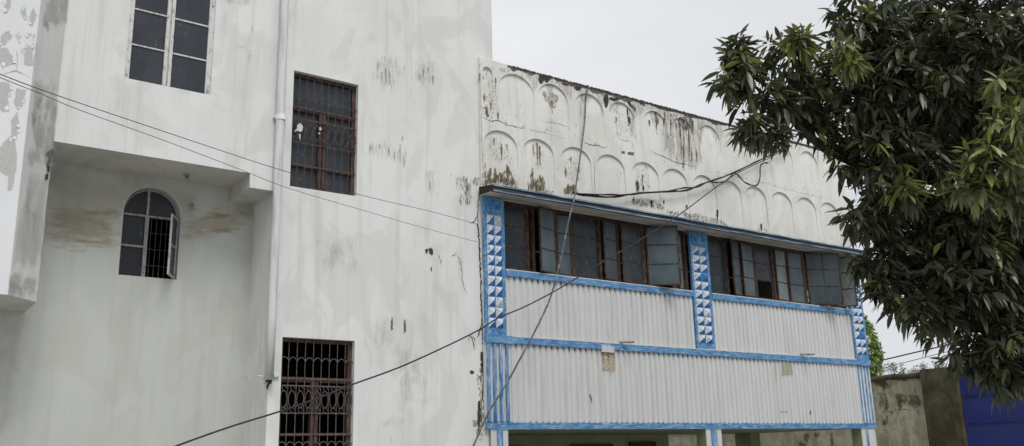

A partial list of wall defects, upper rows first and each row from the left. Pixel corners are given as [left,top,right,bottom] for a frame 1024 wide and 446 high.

peeling [0,0,37,67]
peeling [0,82,26,190]
damp [482,163,554,193]
damp [508,65,739,167]